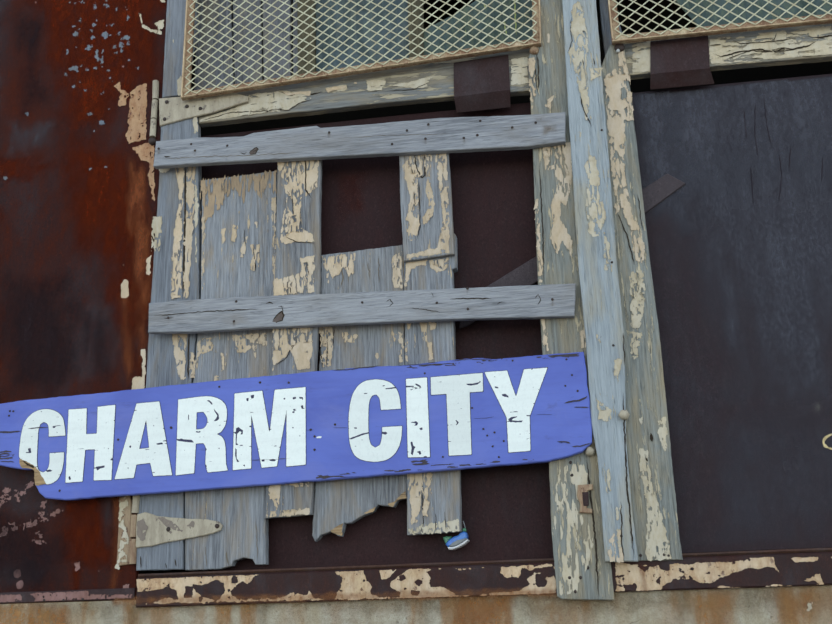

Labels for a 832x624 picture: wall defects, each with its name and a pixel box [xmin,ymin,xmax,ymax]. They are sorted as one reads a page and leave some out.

rust [38,0,162,128]
peeling [709,26,832,64]
rust [67,148,152,374]
peeling [64,19,356,299]
peeling [391,153,450,289]
peeling [568,1,652,381]
peeling [172,326,358,381]
rust [65,499,117,564]
peeling [0,574,324,604]
peeling [335,568,468,600]
peeling [388,472,459,535]
peeling [608,446,779,592]